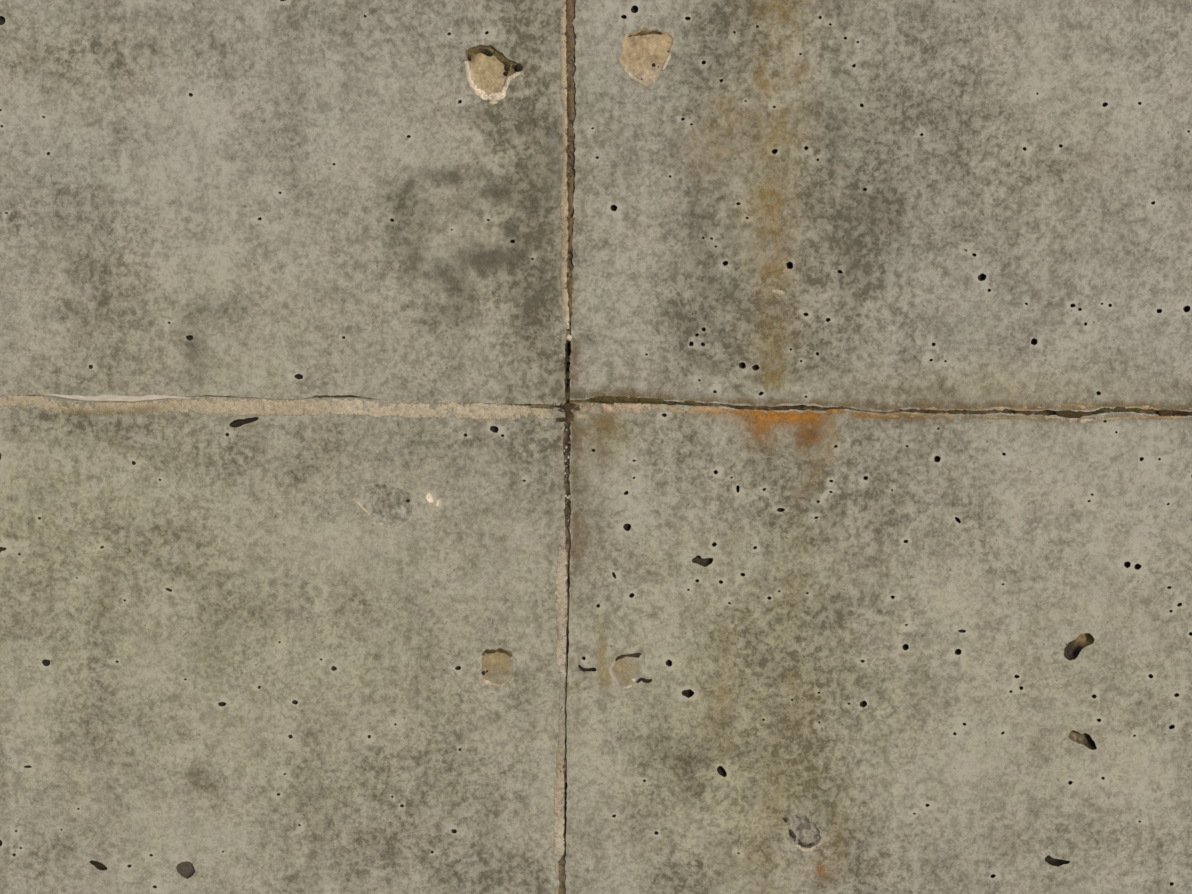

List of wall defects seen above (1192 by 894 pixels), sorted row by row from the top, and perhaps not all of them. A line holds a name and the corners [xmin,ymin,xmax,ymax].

crack [13,394,82,402]
corrosion [739,409,846,445]
crack [113,340,1192,894]
spalling [782,815,823,852]